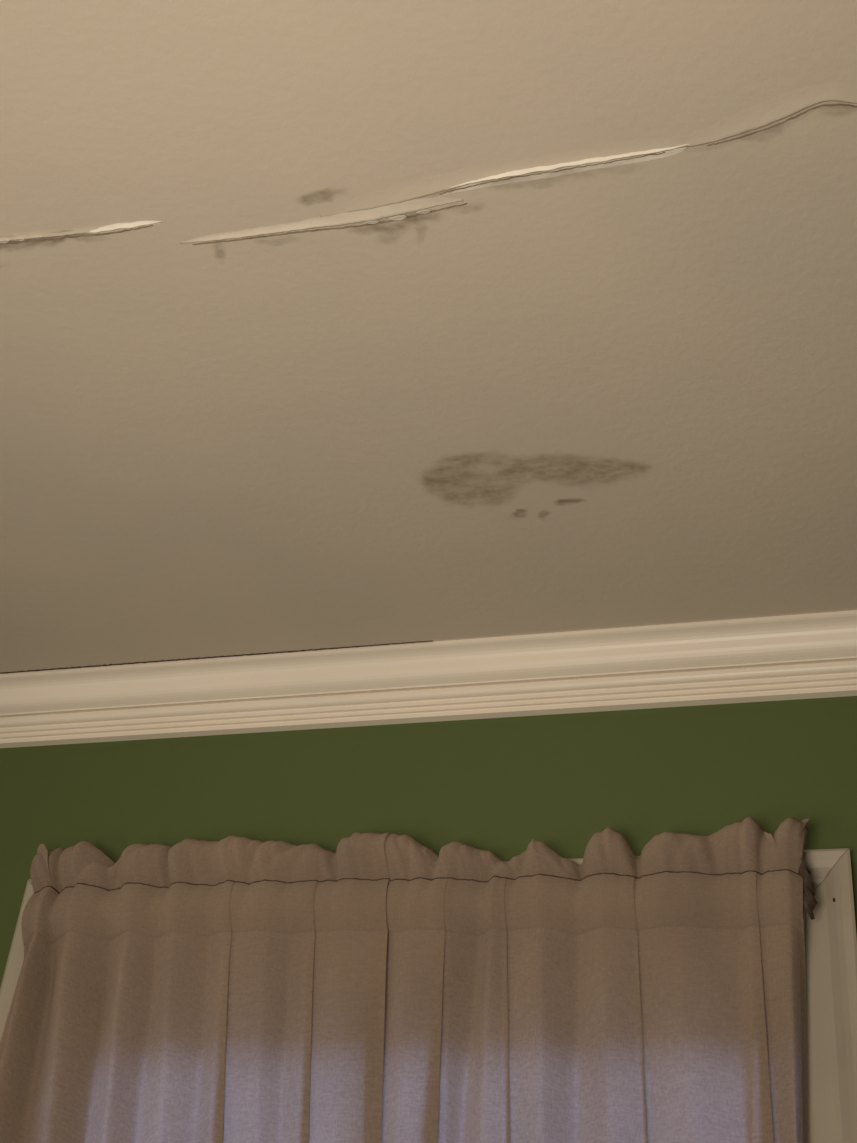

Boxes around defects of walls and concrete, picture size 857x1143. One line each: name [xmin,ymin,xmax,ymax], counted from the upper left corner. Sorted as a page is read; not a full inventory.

crack [0,221,162,245]
crack [180,83,857,245]